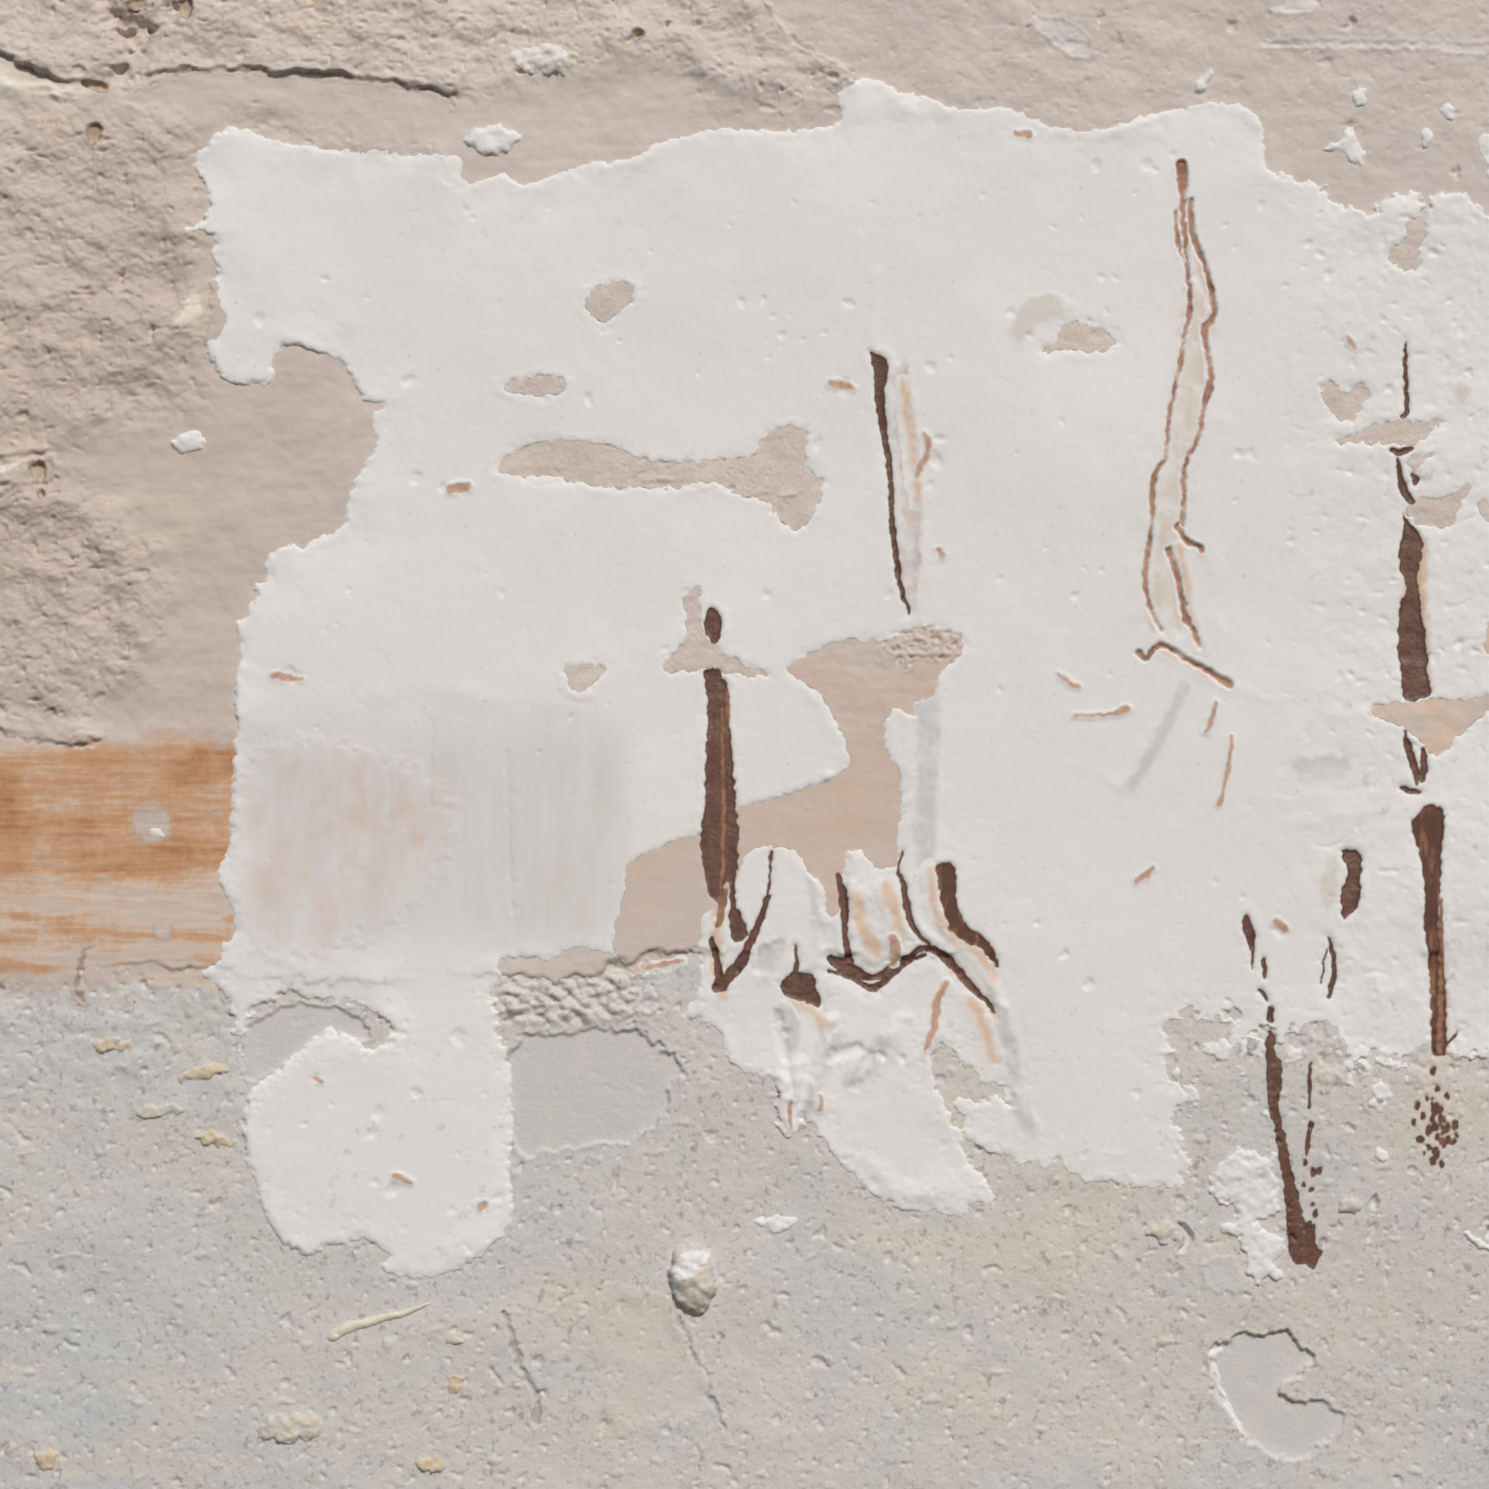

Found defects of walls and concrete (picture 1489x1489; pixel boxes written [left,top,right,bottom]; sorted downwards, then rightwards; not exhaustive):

peeling [498,426,823,530]
crack [1131,156,1238,693]
rust [0,706,468,1001]
spalling [235,998,377,1087]
spalling [505,1021,685,1166]
crack [700,607,774,992]
peeling [612,626,963,975]
crack [780,851,999,1014]
crack [1242,914,1323,1269]
crack [1389,342,1459,1168]
rust [1406,914,1470,1165]
spalling [1206,1323,1352,1465]